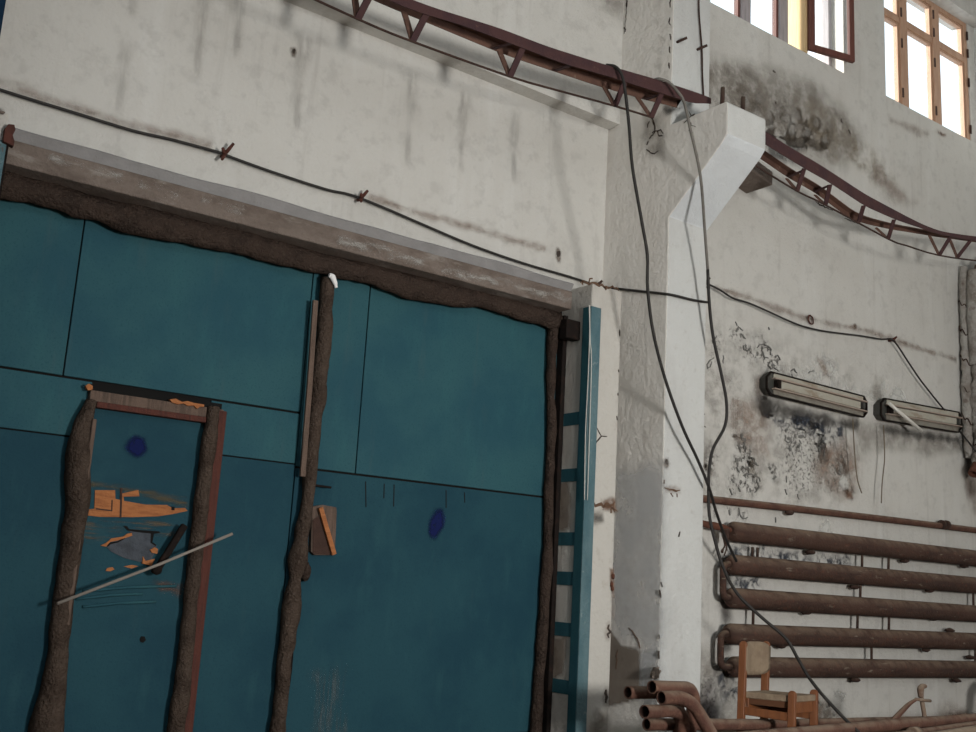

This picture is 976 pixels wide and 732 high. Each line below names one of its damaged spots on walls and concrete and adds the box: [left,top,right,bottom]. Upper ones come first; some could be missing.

damp [766,405,855,499]
flaking render [604,625,661,705]